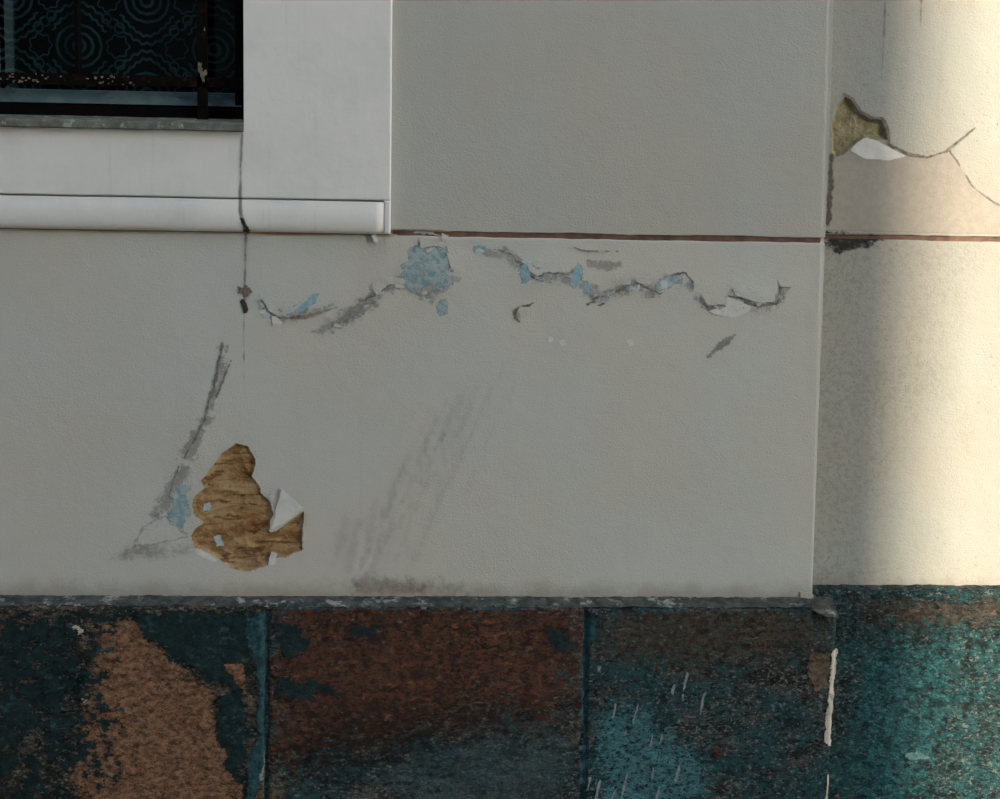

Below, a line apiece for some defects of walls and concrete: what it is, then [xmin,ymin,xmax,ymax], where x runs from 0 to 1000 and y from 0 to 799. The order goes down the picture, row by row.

peeling [829,93,1000,234]
crack [888,127,1000,205]
peeling [258,294,333,325]
peeling [321,228,462,336]
peeling [473,245,793,318]
crack [135,341,232,547]
spalling [188,440,307,575]
peeling [0,609,256,799]